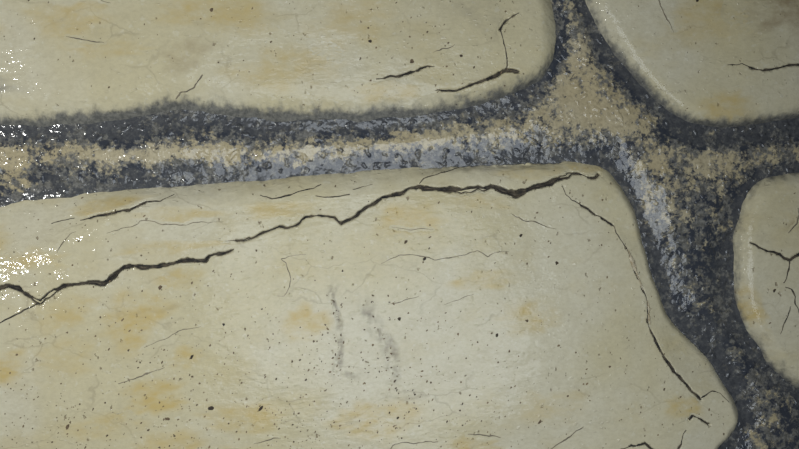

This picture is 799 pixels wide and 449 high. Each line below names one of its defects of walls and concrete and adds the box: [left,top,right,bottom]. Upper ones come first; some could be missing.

crack [376,44,455,79]
crack [435,13,519,92]
crack [728,63,799,71]
crack [0,167,729,449]
crack [750,242,799,334]